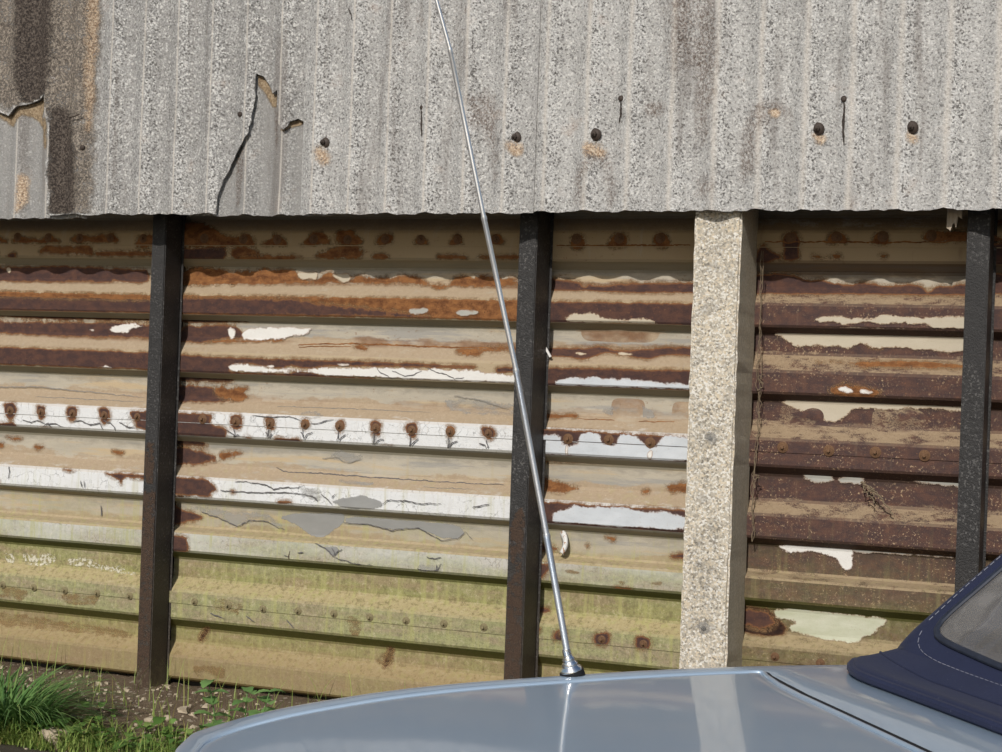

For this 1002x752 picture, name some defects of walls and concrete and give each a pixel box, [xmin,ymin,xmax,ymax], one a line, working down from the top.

damp [0,0,102,214]
rust [756,230,967,297]
rust [0,232,153,371]
rust [550,277,693,325]
peeling [227,326,312,341]
peeling [775,314,964,353]
rust [173,221,519,552]
rust [548,345,691,391]
peeling [783,381,961,422]
peeling [552,504,685,555]
peeling [779,545,953,570]
peeling [774,608,887,644]